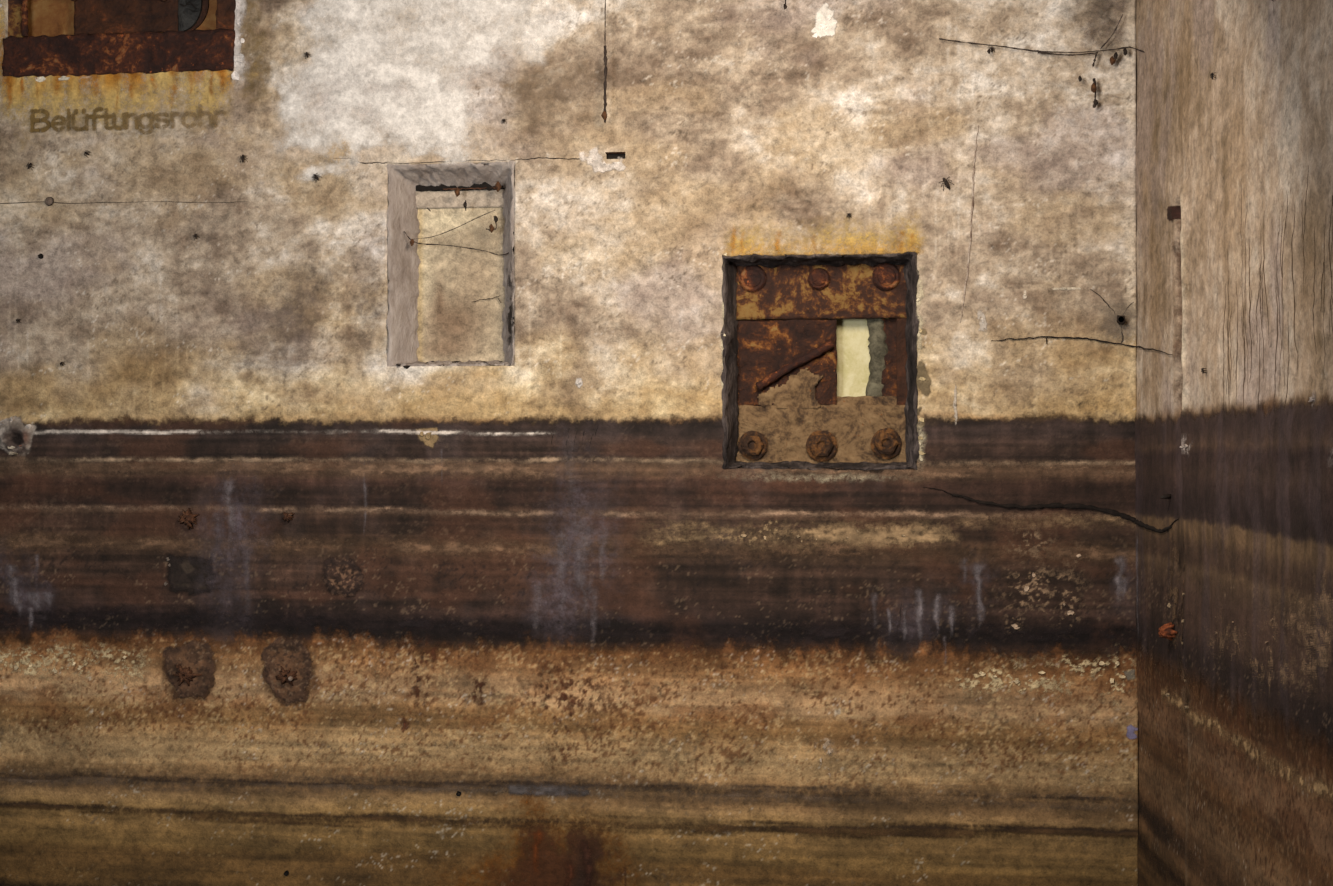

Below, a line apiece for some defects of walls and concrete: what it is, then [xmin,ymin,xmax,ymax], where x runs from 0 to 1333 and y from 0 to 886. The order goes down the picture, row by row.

rust [0,8,232,127]
rust [727,226,922,256]
crack [991,289,1172,355]
crack [925,487,1179,533]
leakage [0,394,1333,797]
rust [463,799,628,886]